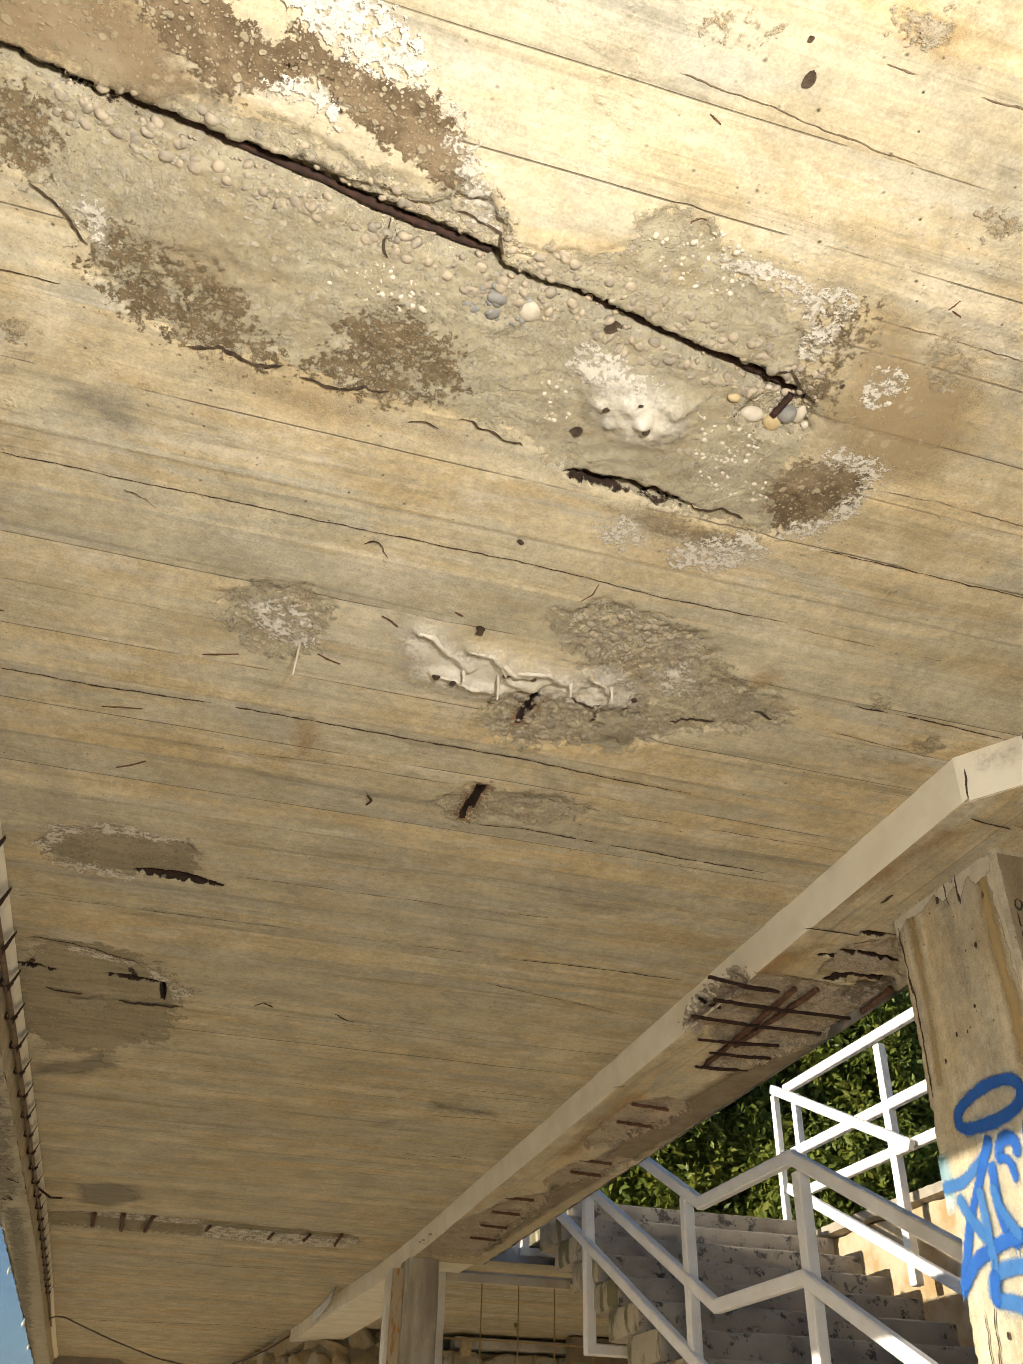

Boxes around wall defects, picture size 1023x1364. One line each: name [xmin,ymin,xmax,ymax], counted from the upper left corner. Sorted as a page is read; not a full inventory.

water stain [0,67,477,414]
water stain [0,0,502,233]
crack [0,41,504,258]
spalling [0,41,832,534]
crack [565,468,743,519]
crack [564,285,805,397]
water stain [589,249,962,576]
spalling [206,572,340,675]
spalling [467,597,802,755]
spalling [26,820,224,886]
spalling [678,852,1023,1074]
spalling [0,887,362,1327]